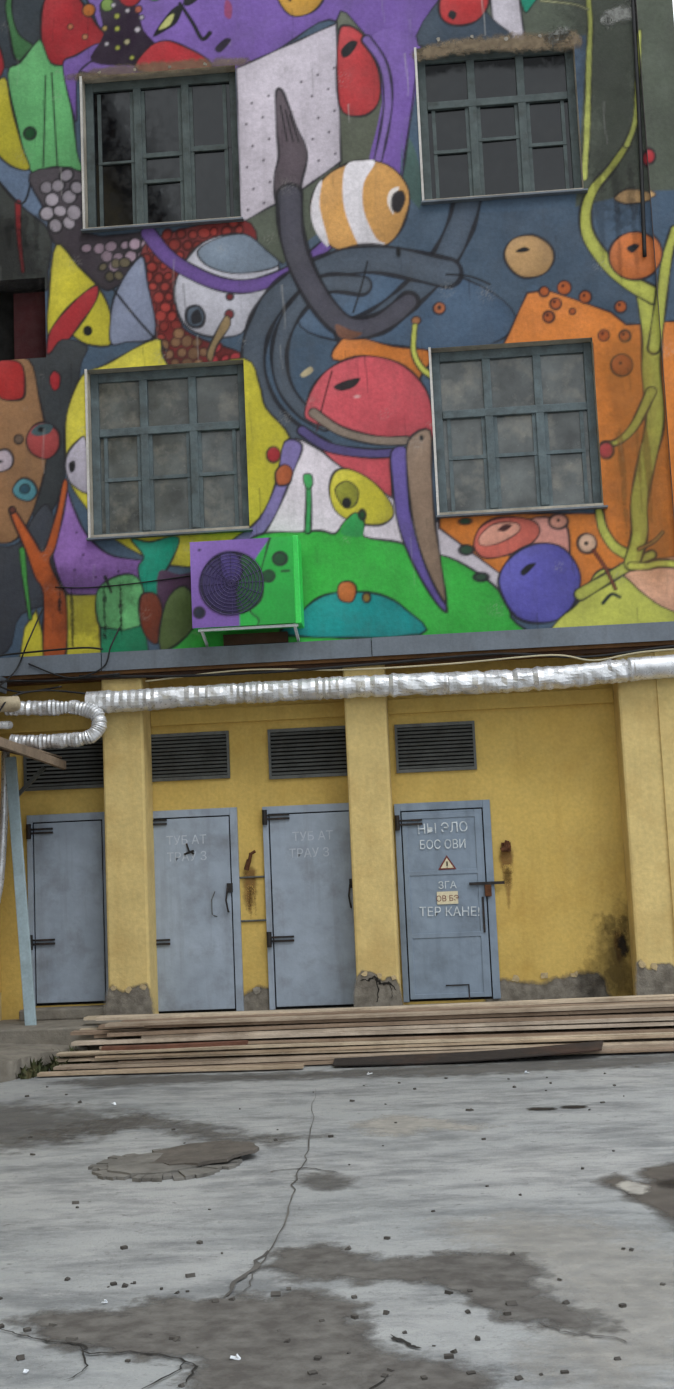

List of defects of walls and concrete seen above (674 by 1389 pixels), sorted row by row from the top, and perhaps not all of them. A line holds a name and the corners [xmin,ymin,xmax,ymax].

corrosion [500,852,512,882]
corrosion [245,869,256,910]
spalling [104,984,154,1015]
spalling [354,971,403,1007]
damp [600,1163,674,1221]
damp [5,1243,619,1389]